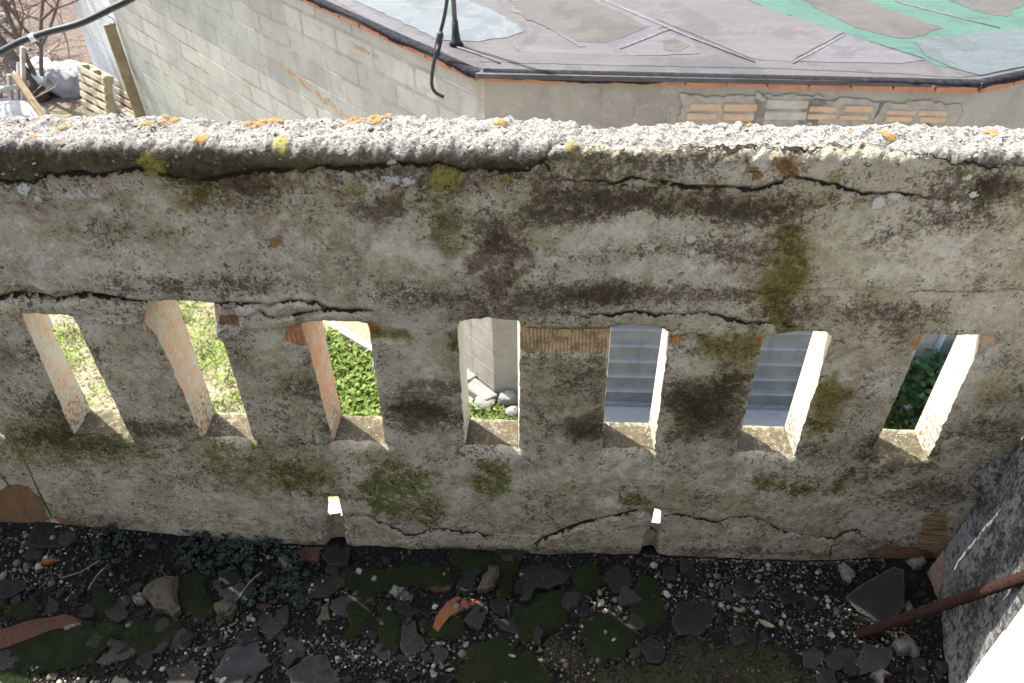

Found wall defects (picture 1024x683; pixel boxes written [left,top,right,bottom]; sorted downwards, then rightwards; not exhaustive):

crack [641,141,1024,169]
crack [0,141,945,200]
crack [0,291,147,303]
crack [215,299,373,319]
crack [529,310,801,328]
crack [349,513,500,550]
crack [535,510,637,551]